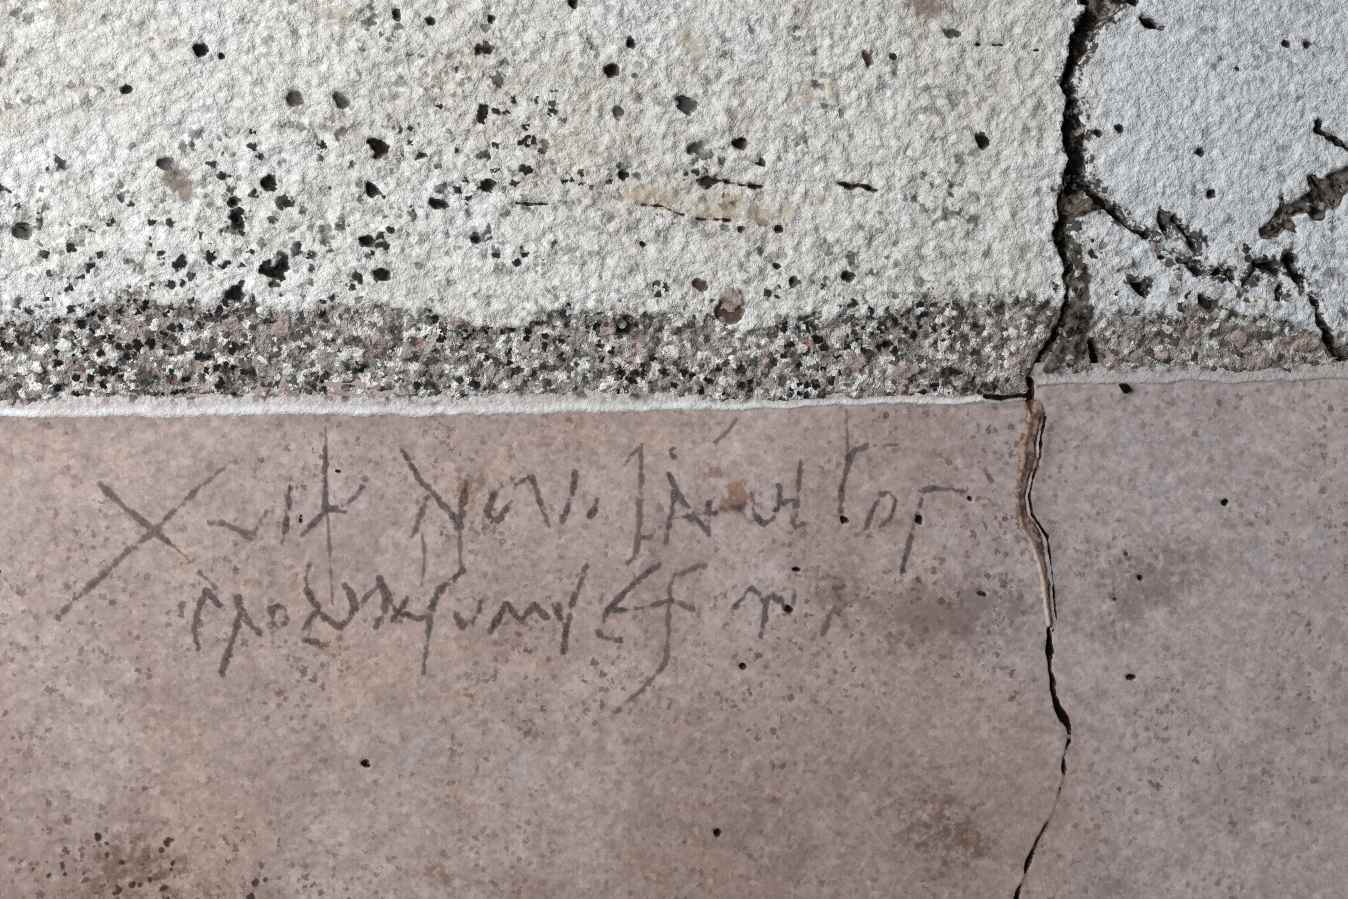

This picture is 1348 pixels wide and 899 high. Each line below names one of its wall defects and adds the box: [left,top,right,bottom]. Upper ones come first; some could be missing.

crack [975,0,1348,899]